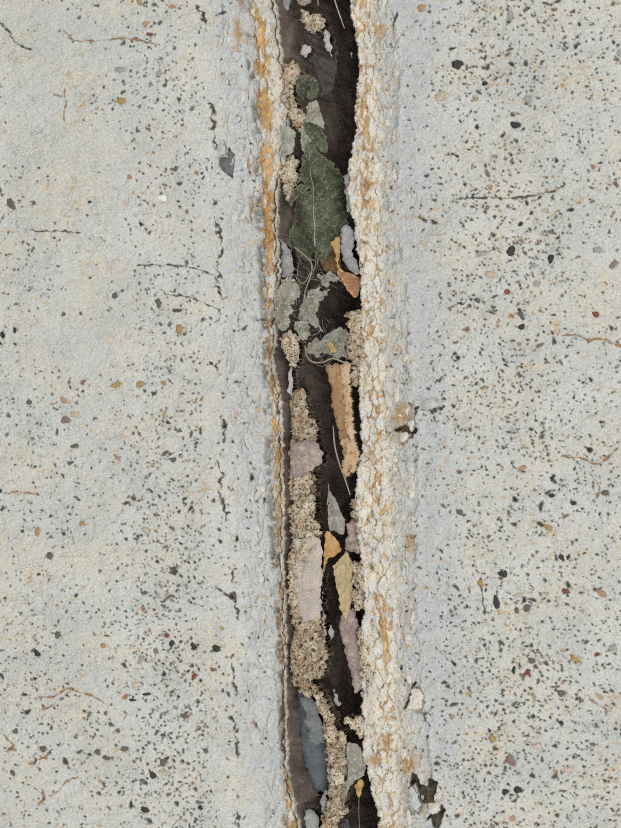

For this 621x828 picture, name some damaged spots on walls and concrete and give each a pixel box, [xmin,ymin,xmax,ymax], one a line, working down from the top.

crack [270,0,381,828]
spalling [346,0,443,828]